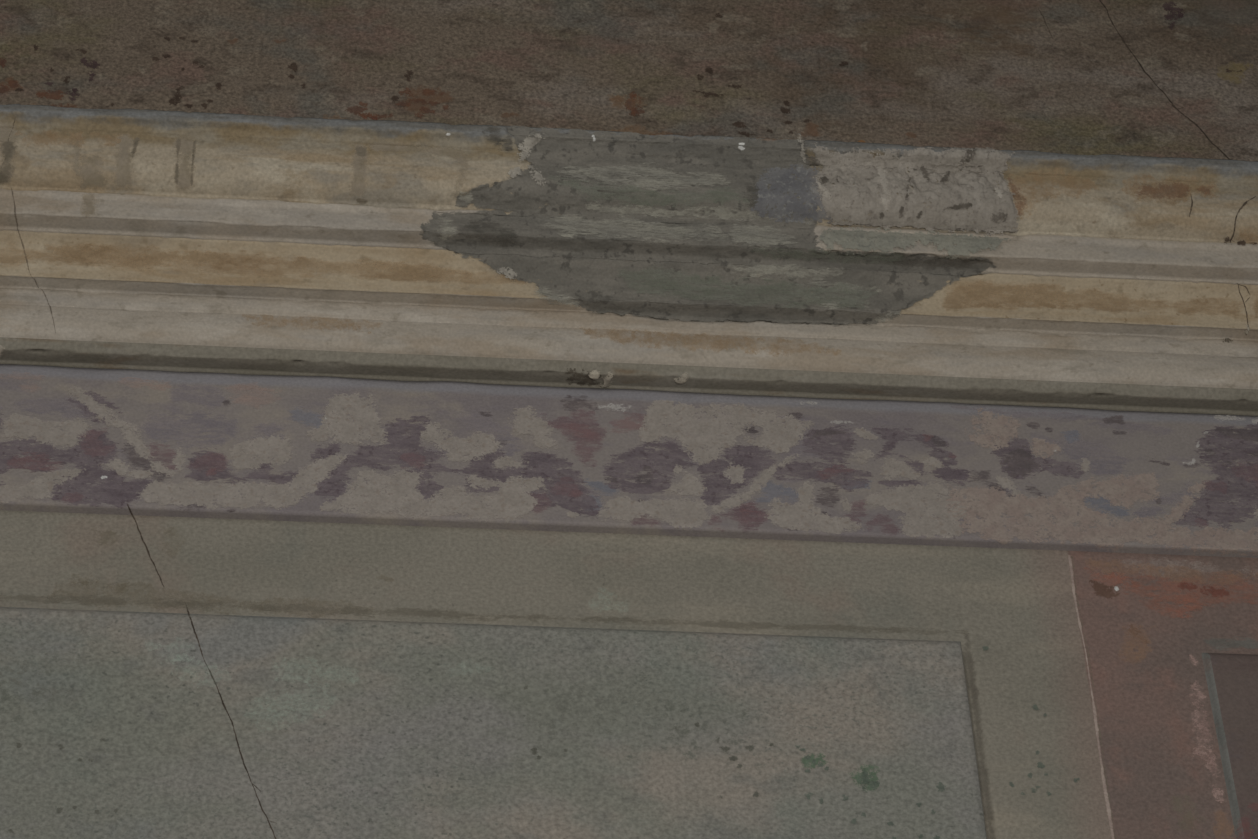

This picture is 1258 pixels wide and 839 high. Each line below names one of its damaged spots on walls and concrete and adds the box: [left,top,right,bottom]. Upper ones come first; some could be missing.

crack [1099,0,1231,160]
flaking render [420,100,997,327]
crack [1230,196,1256,243]
crack [1237,283,1250,326]
peeling [0,368,1172,539]
peeling [1084,415,1258,556]
crack [127,504,276,839]